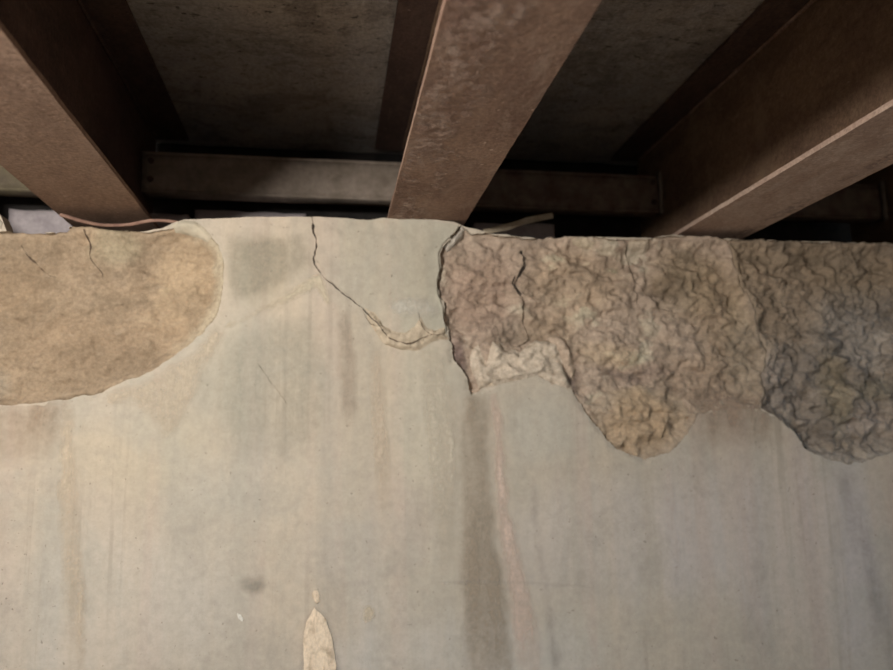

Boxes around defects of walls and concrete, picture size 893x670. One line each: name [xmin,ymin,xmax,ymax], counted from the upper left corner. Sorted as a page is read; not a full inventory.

spalling [0,220,224,406]
crack [311,216,440,345]
crack [512,251,529,347]
spalling [437,227,893,465]
peeling [303,591,337,670]